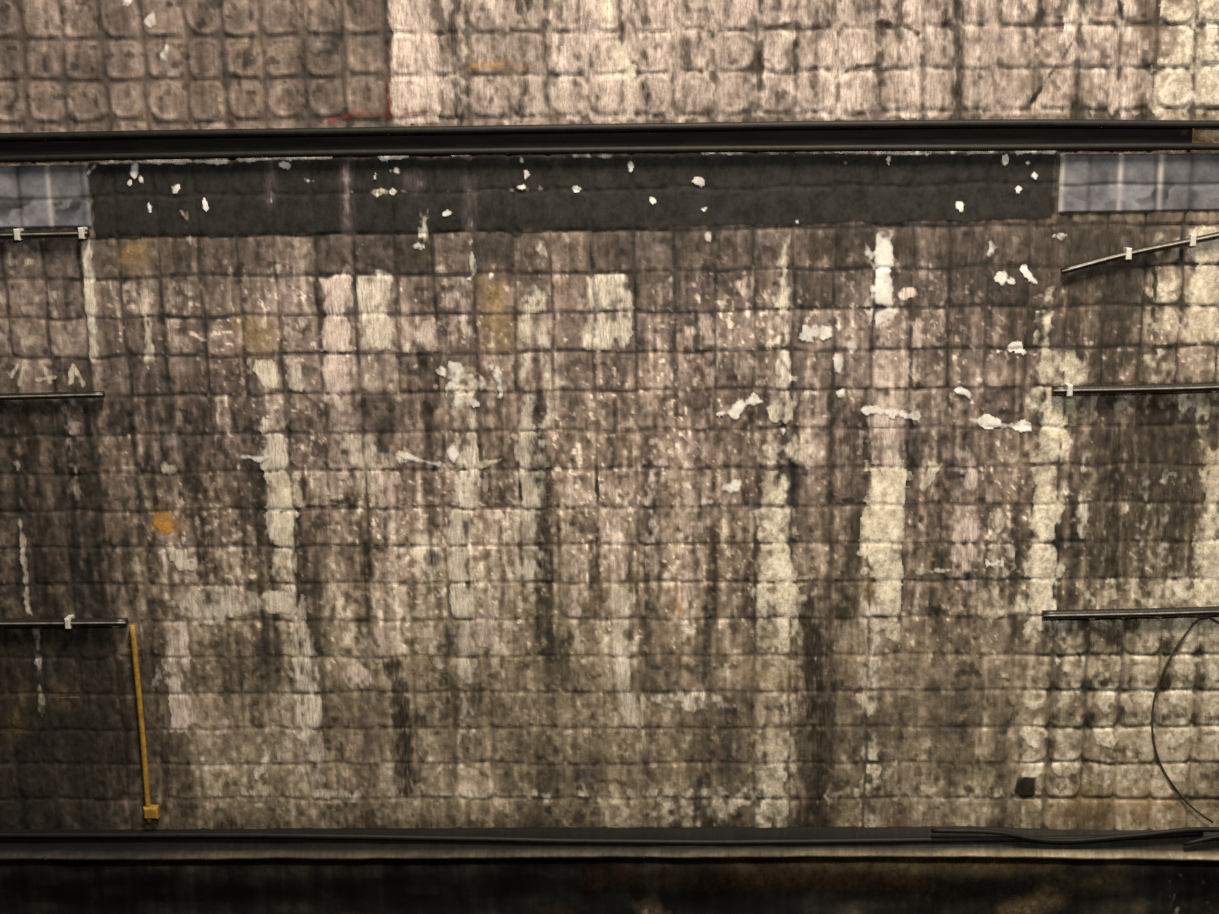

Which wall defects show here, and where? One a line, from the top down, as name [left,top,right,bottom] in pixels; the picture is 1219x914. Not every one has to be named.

peeling [388,0,1219,126]
peeling [87,157,332,186]
peeling [379,156,408,173]
peeling [812,151,932,165]
peeling [950,151,1056,179]
damp [247,320,304,392]
damp [582,274,632,352]
damp [260,270,435,803]
damp [424,379,485,683]
damp [840,235,973,714]
damp [952,226,1219,650]
damp [739,472,836,828]